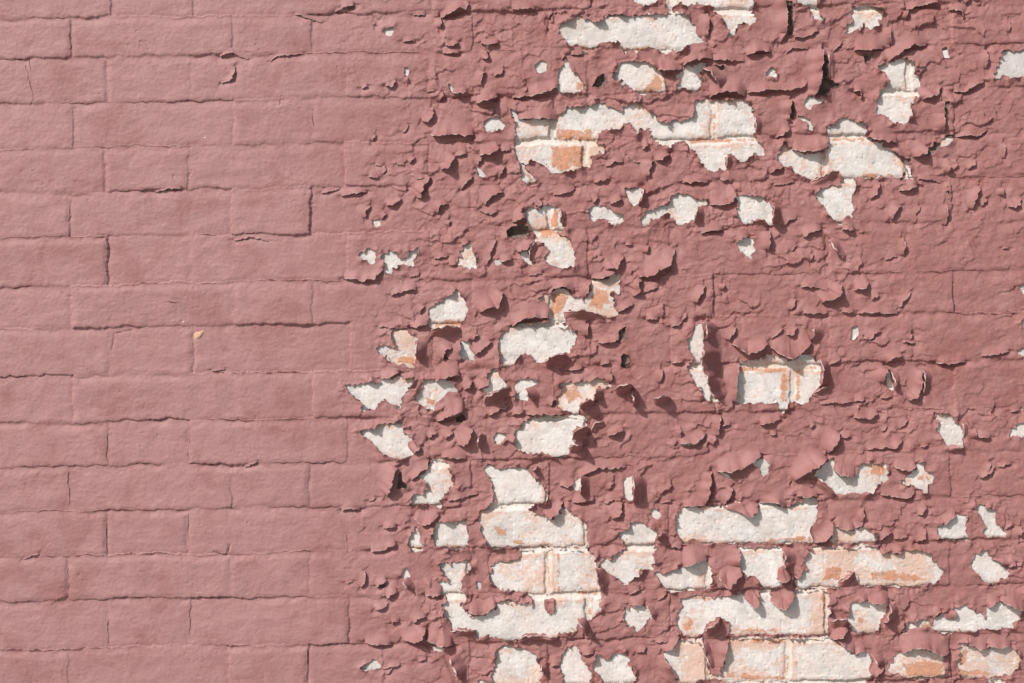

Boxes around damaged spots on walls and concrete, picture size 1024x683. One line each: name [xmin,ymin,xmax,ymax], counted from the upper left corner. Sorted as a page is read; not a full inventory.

peeling [335,0,355,12]
crack [27,16,72,52]
crack [269,49,419,57]
crack [60,98,236,106]
crack [109,187,182,195]
peeling [341,0,1024,683]
crack [213,368,297,376]
crack [106,417,345,476]
crack [271,503,341,511]
crack [2,465,189,603]
crack [2,597,249,652]
crack [307,642,367,664]